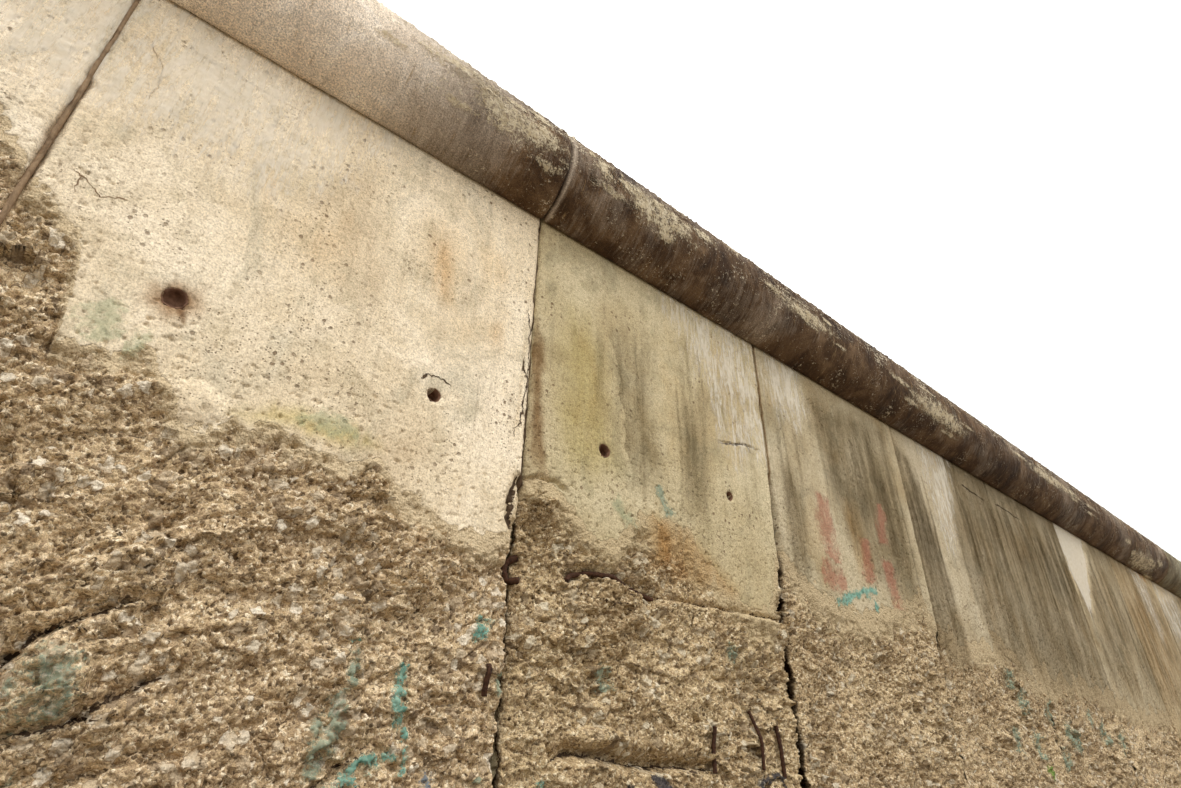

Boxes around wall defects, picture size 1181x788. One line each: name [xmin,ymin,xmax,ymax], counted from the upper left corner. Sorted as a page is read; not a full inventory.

spalling [0,101,28,212]
crack [504,311,531,531]
leakage [766,358,805,423]
spalling [0,177,1181,788]
leakage [919,444,954,547]
leakage [1052,522,1091,611]